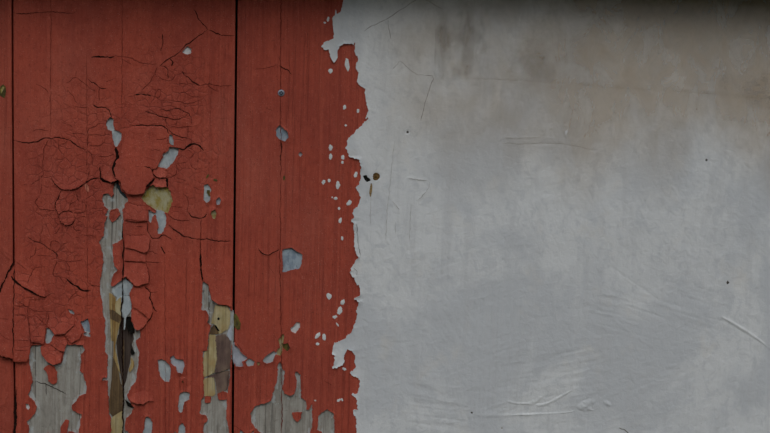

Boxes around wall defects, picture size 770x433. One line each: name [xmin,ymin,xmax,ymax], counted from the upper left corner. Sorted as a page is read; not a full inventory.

peeling [276,125,288,141]
crack [0,0,235,433]
peeling [99,117,179,433]
peeling [203,174,221,219]
peeling [282,248,303,272]
peeling [16,309,90,433]
peeling [158,356,190,413]
peeling [200,256,335,433]